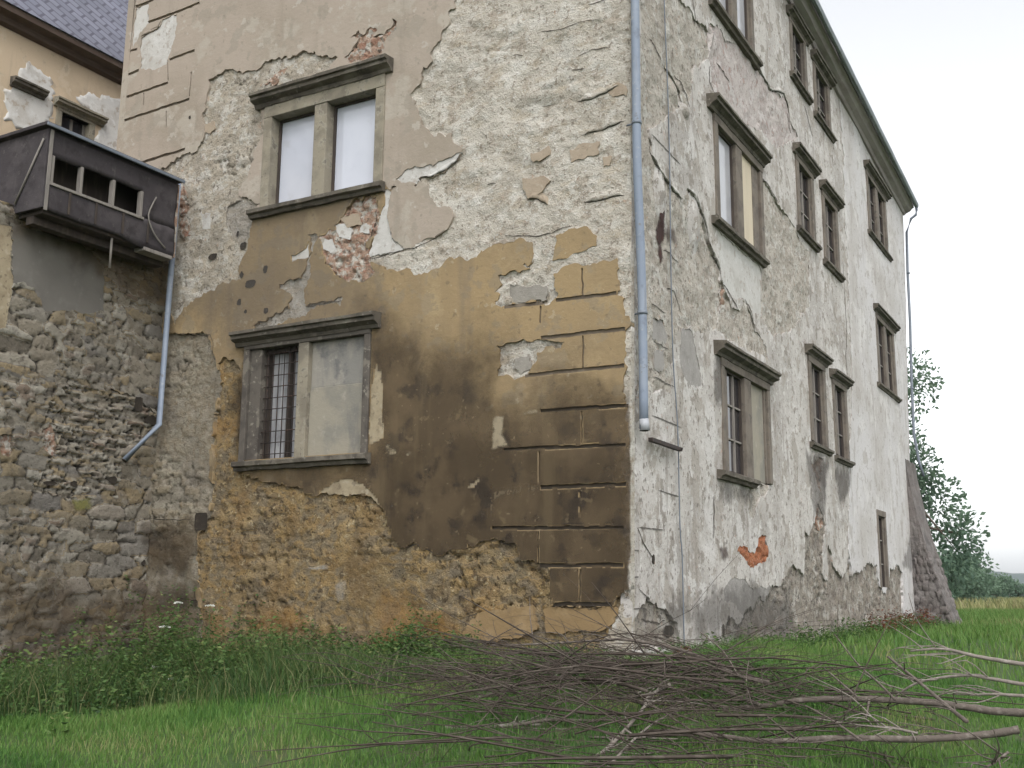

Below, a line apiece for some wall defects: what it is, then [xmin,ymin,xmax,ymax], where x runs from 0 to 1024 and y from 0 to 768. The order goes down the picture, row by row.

flaking render [3,61,55,129]
crack [760,68,812,133]
crack [649,146,755,325]
flaking render [33,0,810,659]
water stain [254,324,631,607]
flaking render [721,506,902,645]